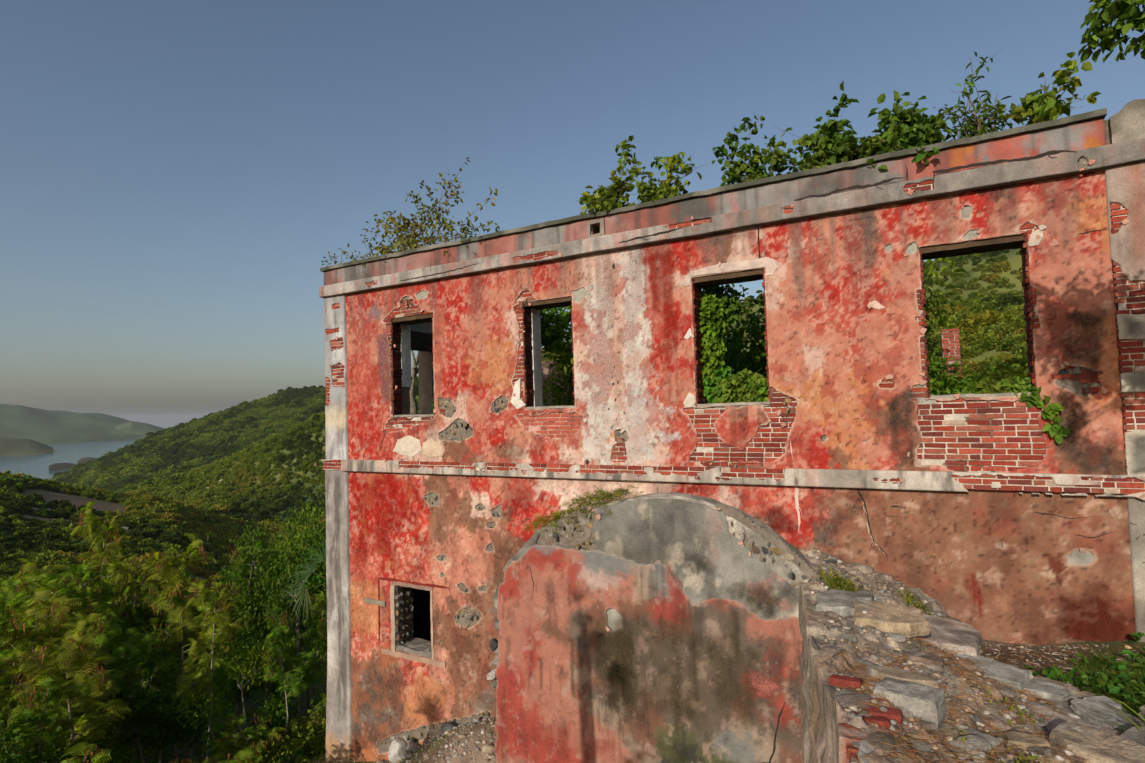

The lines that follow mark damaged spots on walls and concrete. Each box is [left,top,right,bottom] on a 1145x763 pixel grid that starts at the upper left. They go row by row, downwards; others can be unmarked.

crack [794,150,1076,201]
flaking render [884,242,918,257]
flaking render [961,202,984,240]
spalling [1019,221,1059,247]
spalling [1109,202,1129,235]
spalling [381,291,474,442]
spalling [907,260,1145,500]
spalling [383,366,801,482]
spalling [476,504,503,528]
crack [857,488,906,557]
flaking render [1067,547,1095,565]
water stain [740,589,779,616]